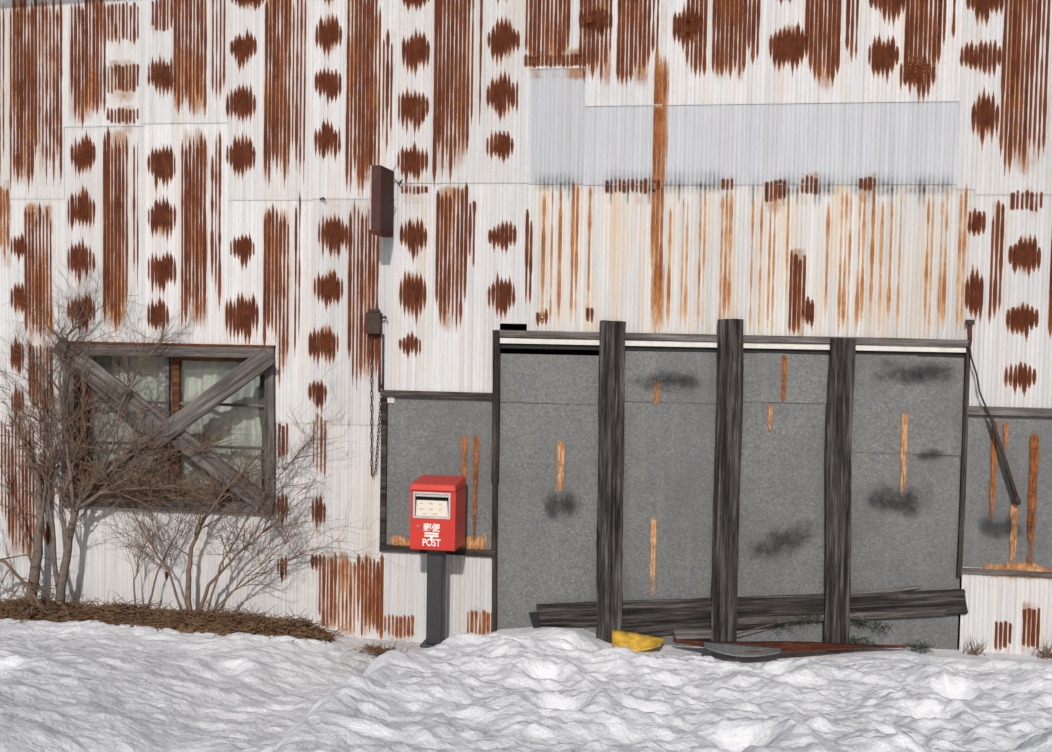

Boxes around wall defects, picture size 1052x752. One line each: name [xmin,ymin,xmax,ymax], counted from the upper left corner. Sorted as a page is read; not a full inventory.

rust [673,0,1051,175]
rust [0,0,706,555]
rust [719,179,733,320]
rust [749,175,902,336]
rust [924,184,1052,341]
rust [768,355,787,430]
rust [1004,361,1036,396]
rust [990,422,1008,515]
rust [1010,434,1039,565]
rust [311,553,414,640]